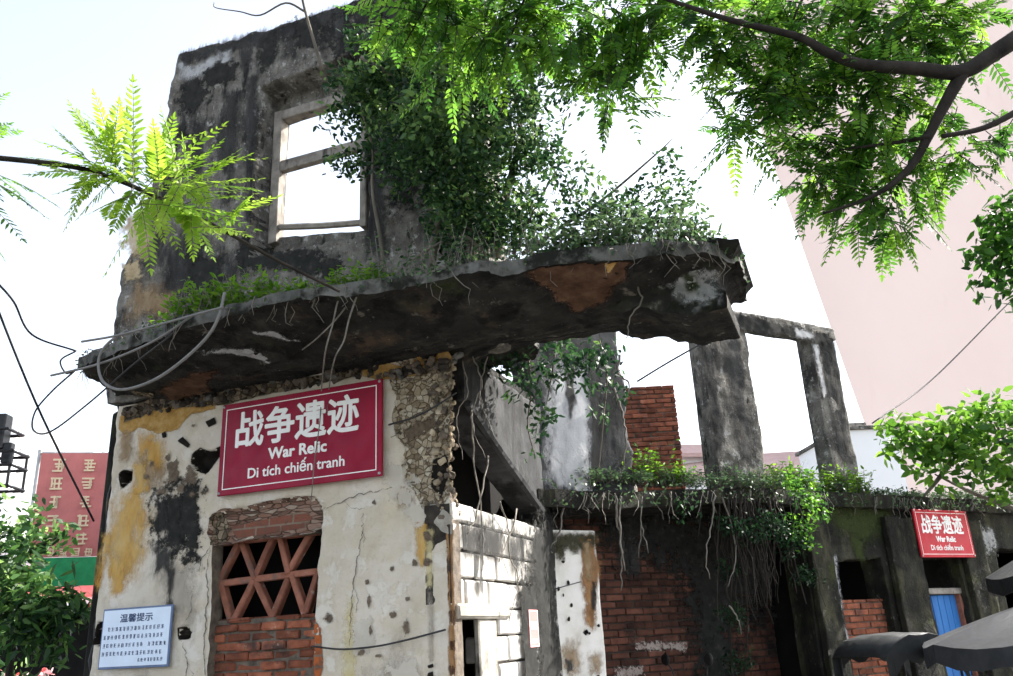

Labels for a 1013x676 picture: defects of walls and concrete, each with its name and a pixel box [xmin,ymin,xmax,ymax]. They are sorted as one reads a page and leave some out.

leakage [127,0,402,318]
leakage [365,75,426,256]
flaking render [119,352,456,545]
leakage [565,364,577,417]
leakage [589,365,602,481]
leakage [704,314,851,463]
leakage [96,452,208,619]
crack [328,487,392,645]
crack [426,602,434,676]
leakage [464,495,602,676]
leakage [614,665,646,676]